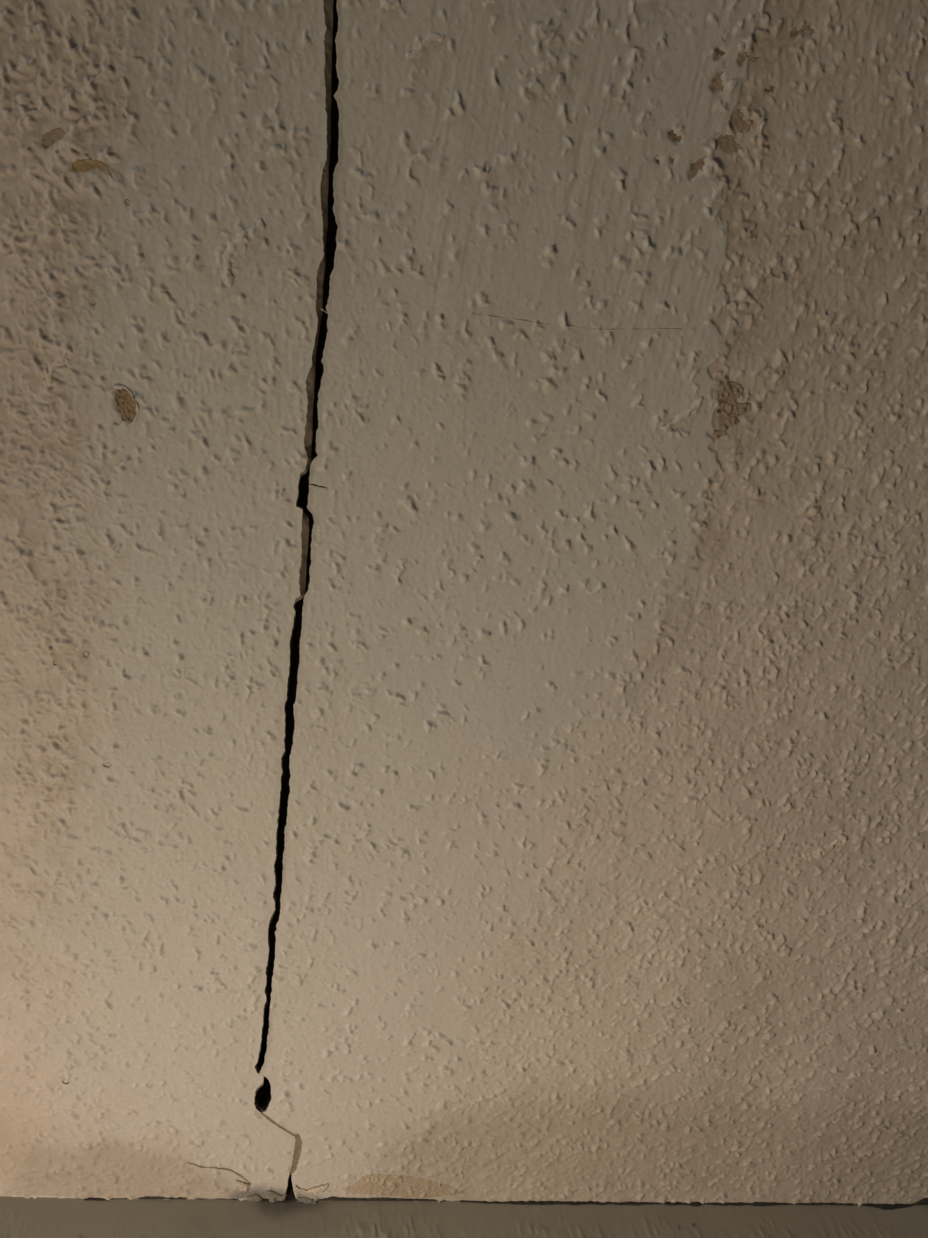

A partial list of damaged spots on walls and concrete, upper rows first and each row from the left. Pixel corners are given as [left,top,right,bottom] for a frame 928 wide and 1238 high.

crack [255,0,339,1074]
crack [84,1194,195,1202]
crack [233,1113,928,1209]